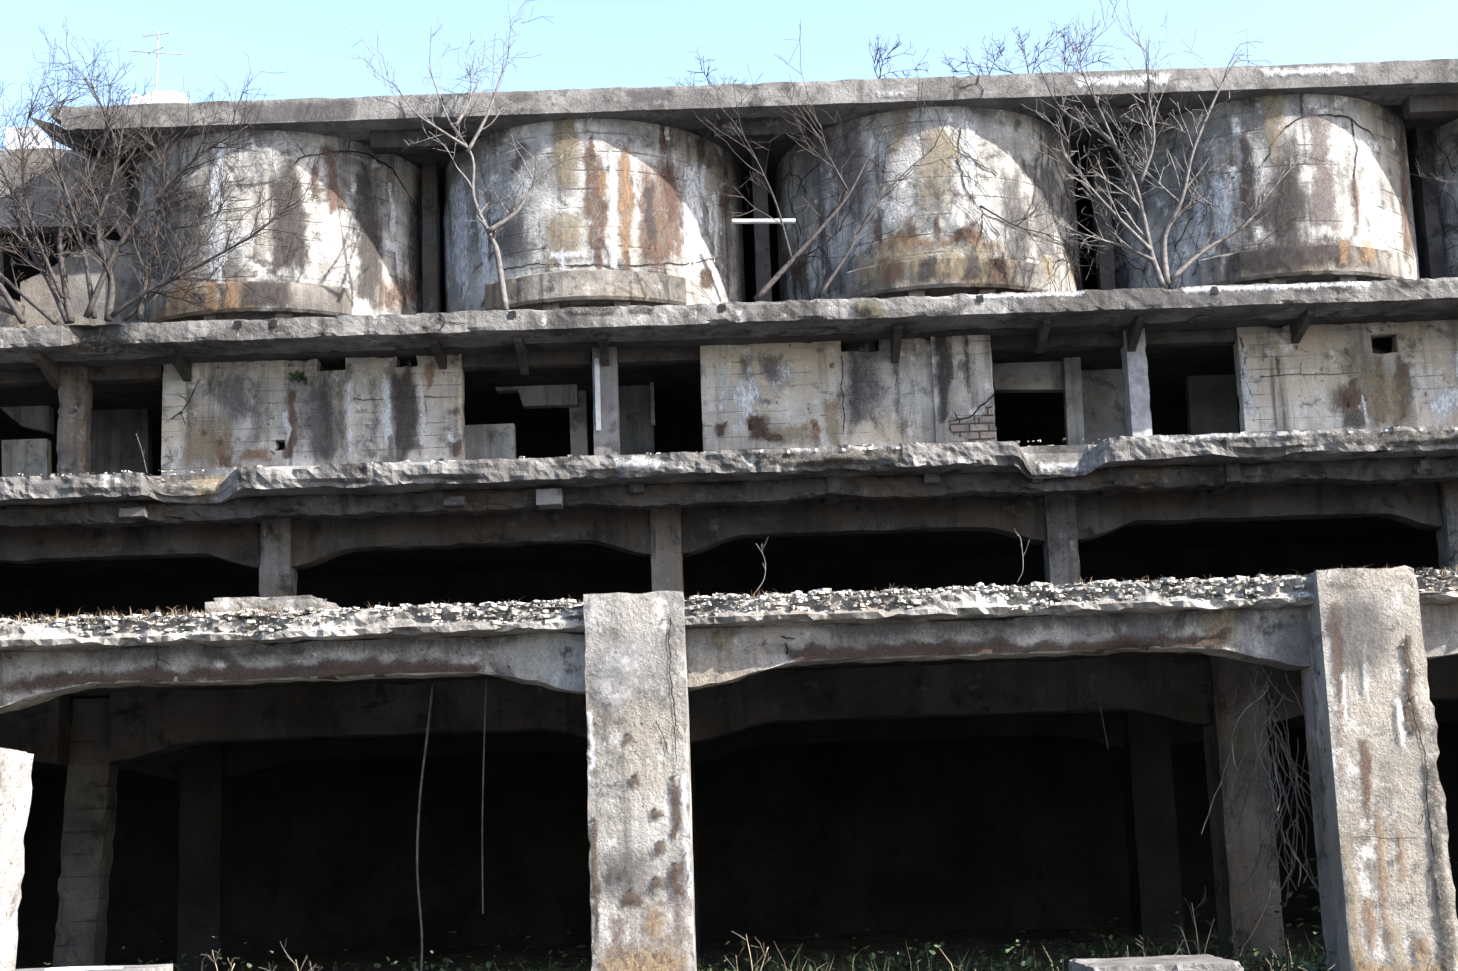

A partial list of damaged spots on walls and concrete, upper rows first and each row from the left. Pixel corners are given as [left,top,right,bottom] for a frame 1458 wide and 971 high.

water stain [1075,74,1169,86]
water stain [1261,66,1354,77]
corrosion [584,125,683,270]
corrosion [720,171,731,217]
water stain [1137,94,1369,305]
water stain [297,362,425,462]
water stain [773,343,921,445]
water stain [933,335,970,424]
flaking render [949,402,997,442]
corrosion [1335,355,1408,424]
corrosion [1327,602,1446,971]
corrosion [600,889,690,971]